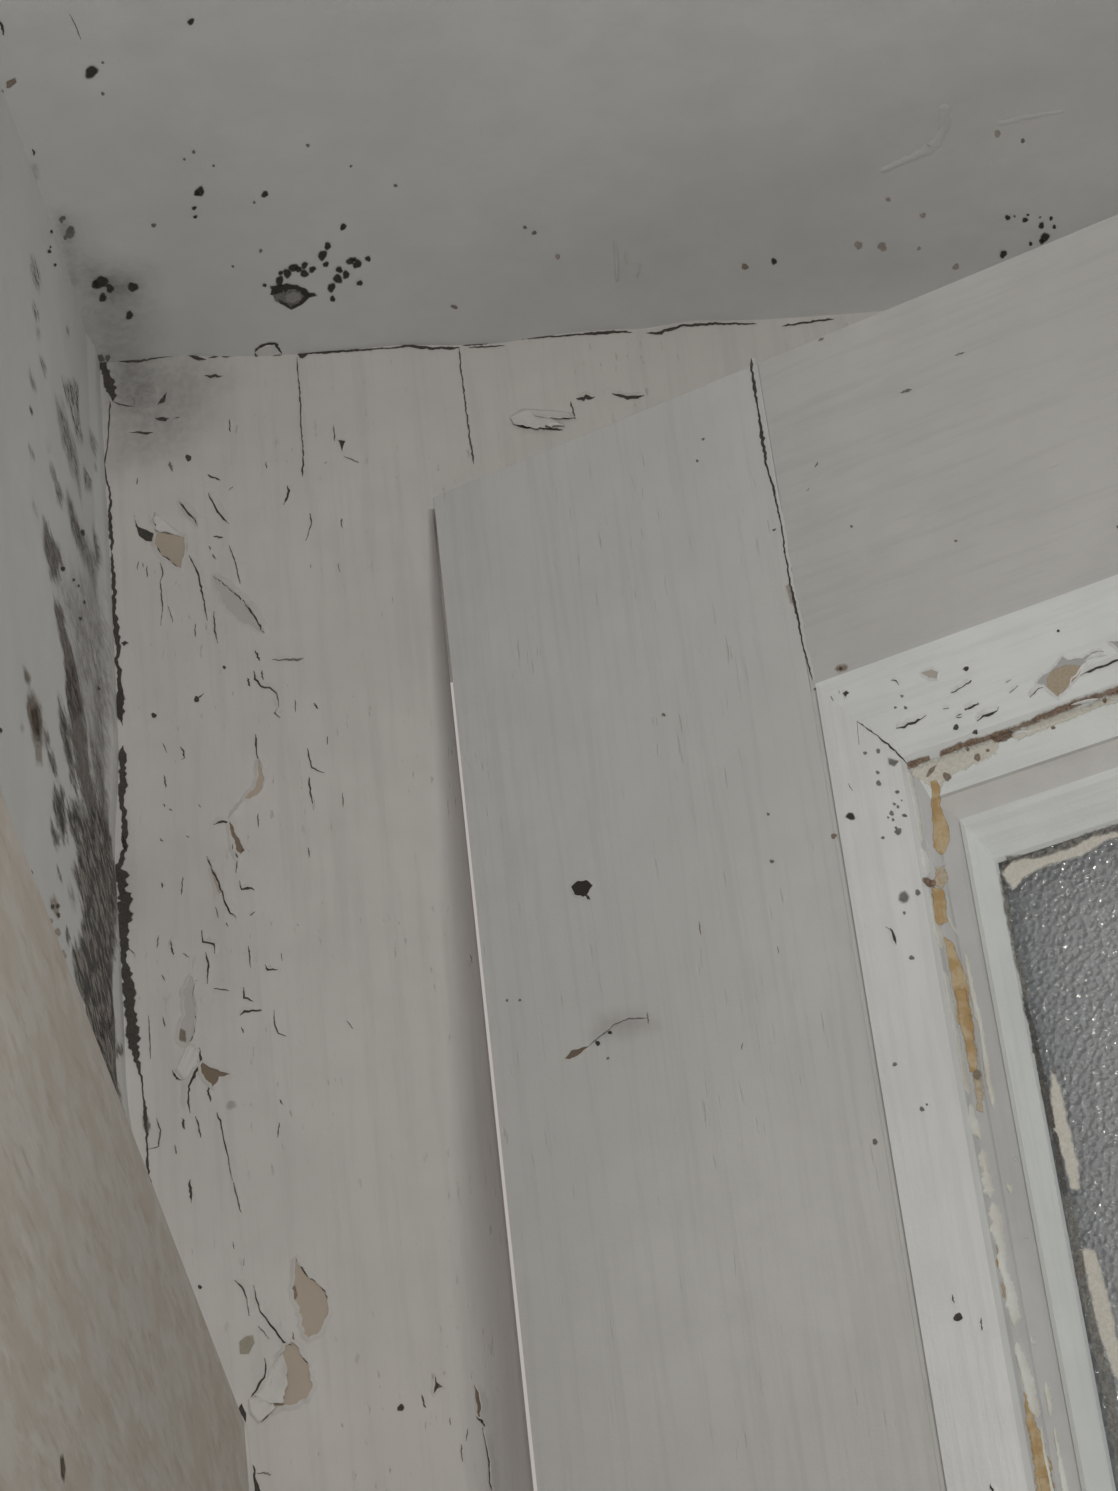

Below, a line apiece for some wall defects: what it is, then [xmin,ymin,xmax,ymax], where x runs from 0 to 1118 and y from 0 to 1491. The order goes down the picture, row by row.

leakage [60,383,92,487]
leakage [92,276,138,301]
peeling [135,473,270,637]
leakage [263,224,371,310]
crack [297,318,833,680]
peeling [510,390,644,431]
leakage [25,473,123,1096]
peeling [148,734,269,1115]
crack [100,355,344,1213]
peeling [912,638,1118,1112]
peeling [233,1244,334,1491]
peeling [1024,1392,1055,1491]